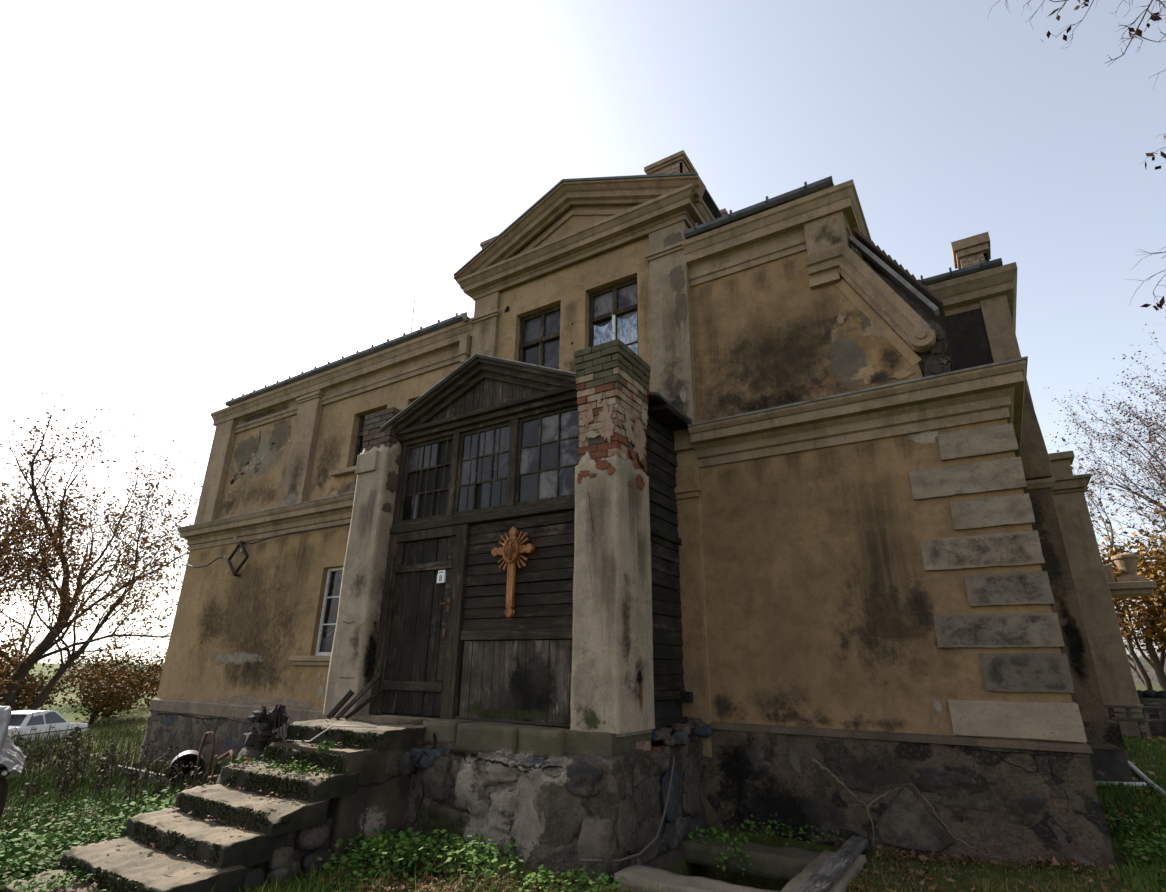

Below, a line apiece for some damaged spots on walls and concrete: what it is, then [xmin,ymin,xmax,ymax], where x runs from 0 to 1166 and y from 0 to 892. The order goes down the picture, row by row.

peeling [829,304,951,392]
peeling [228,420,292,494]
peeling [577,392,648,490]
leakage [204,598,292,681]